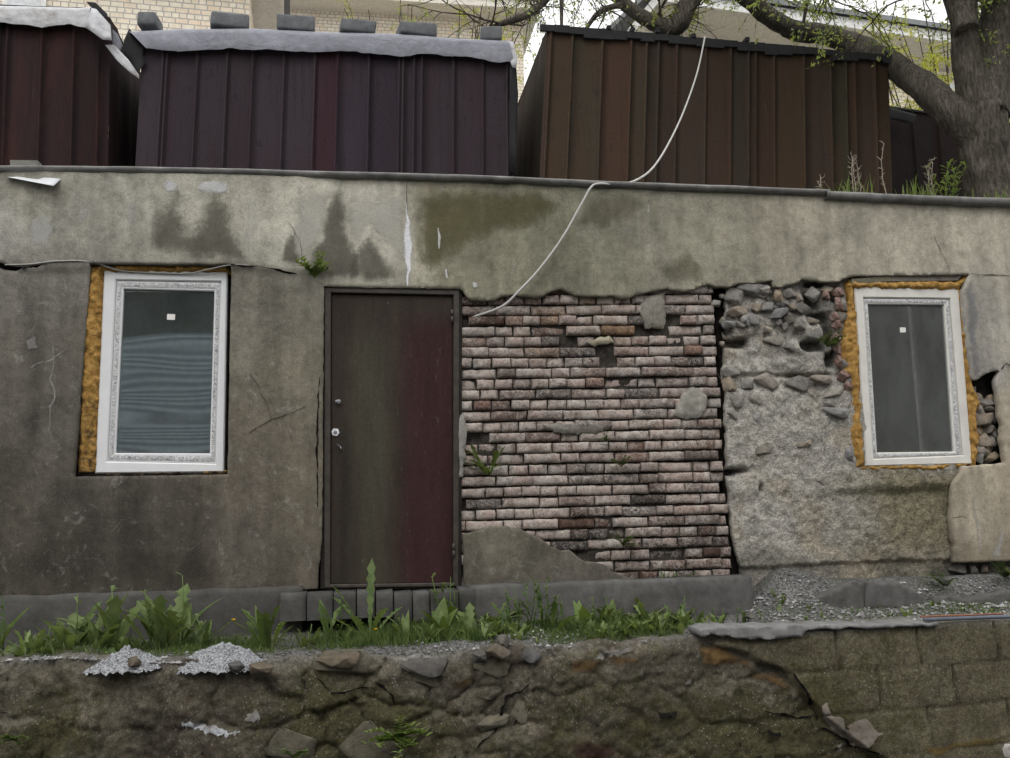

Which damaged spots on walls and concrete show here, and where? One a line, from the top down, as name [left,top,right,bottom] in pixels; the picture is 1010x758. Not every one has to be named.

water stain [155,181,236,254]
crack [0,261,86,271]
spalling [452,278,1010,589]
crack [765,673,886,758]